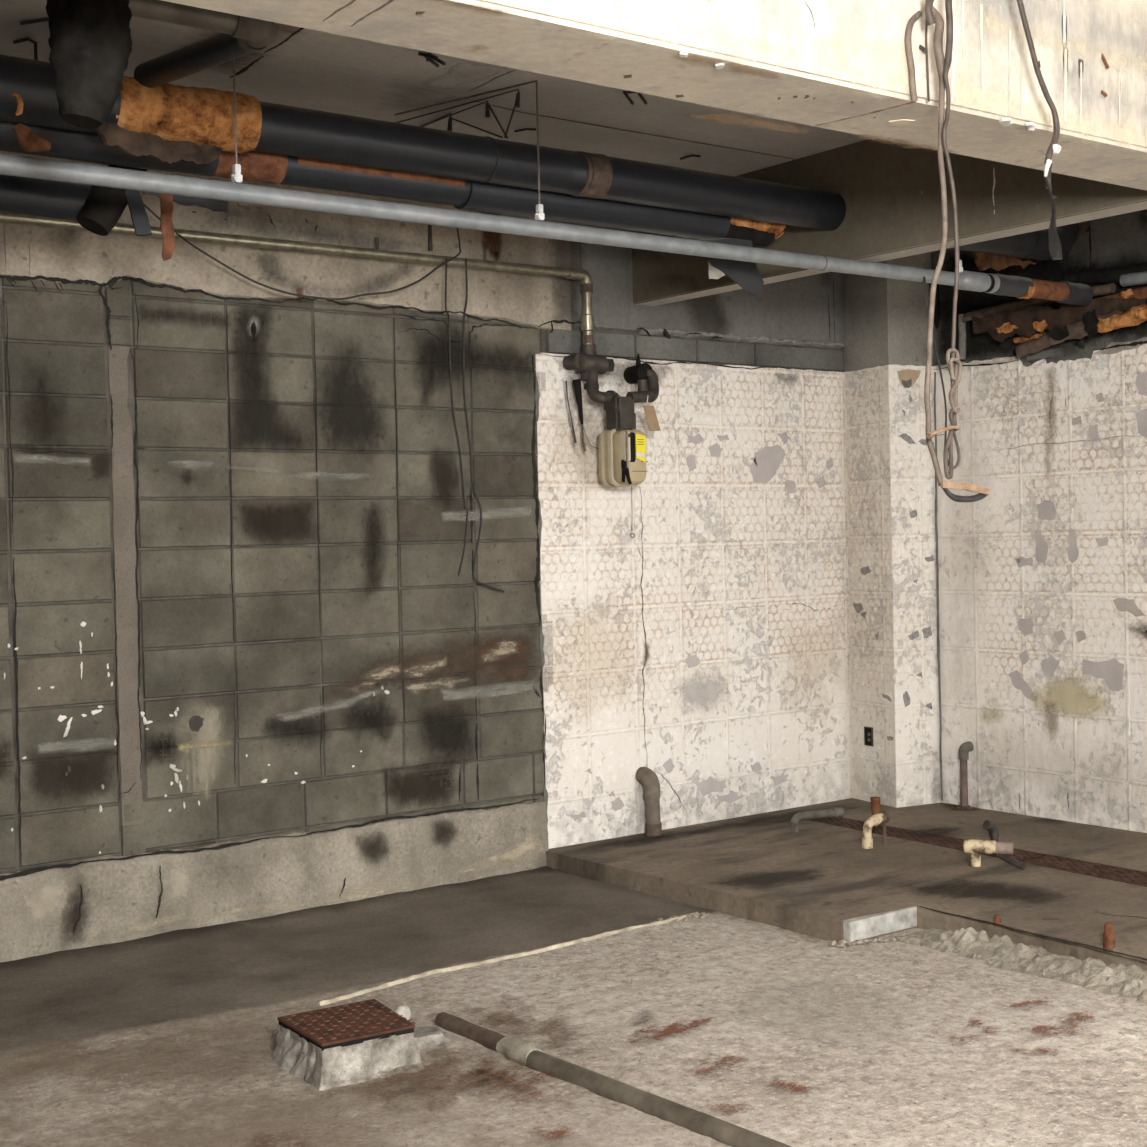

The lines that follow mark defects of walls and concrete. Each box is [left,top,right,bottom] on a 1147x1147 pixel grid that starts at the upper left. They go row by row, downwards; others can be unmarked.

spalling [1020,337,1147,367]
peeling [687,434,729,472]
peeling [750,432,796,494]
peeling [1015,500,1057,567]
peeling [1113,598,1146,617]
crack [638,486,685,809]
peeling [1009,630,1086,701]
peeling [1082,658,1125,692]
crack [0,798,540,919]
damp [362,834,388,861]
damp [436,822,456,842]
damp [24,886,86,937]